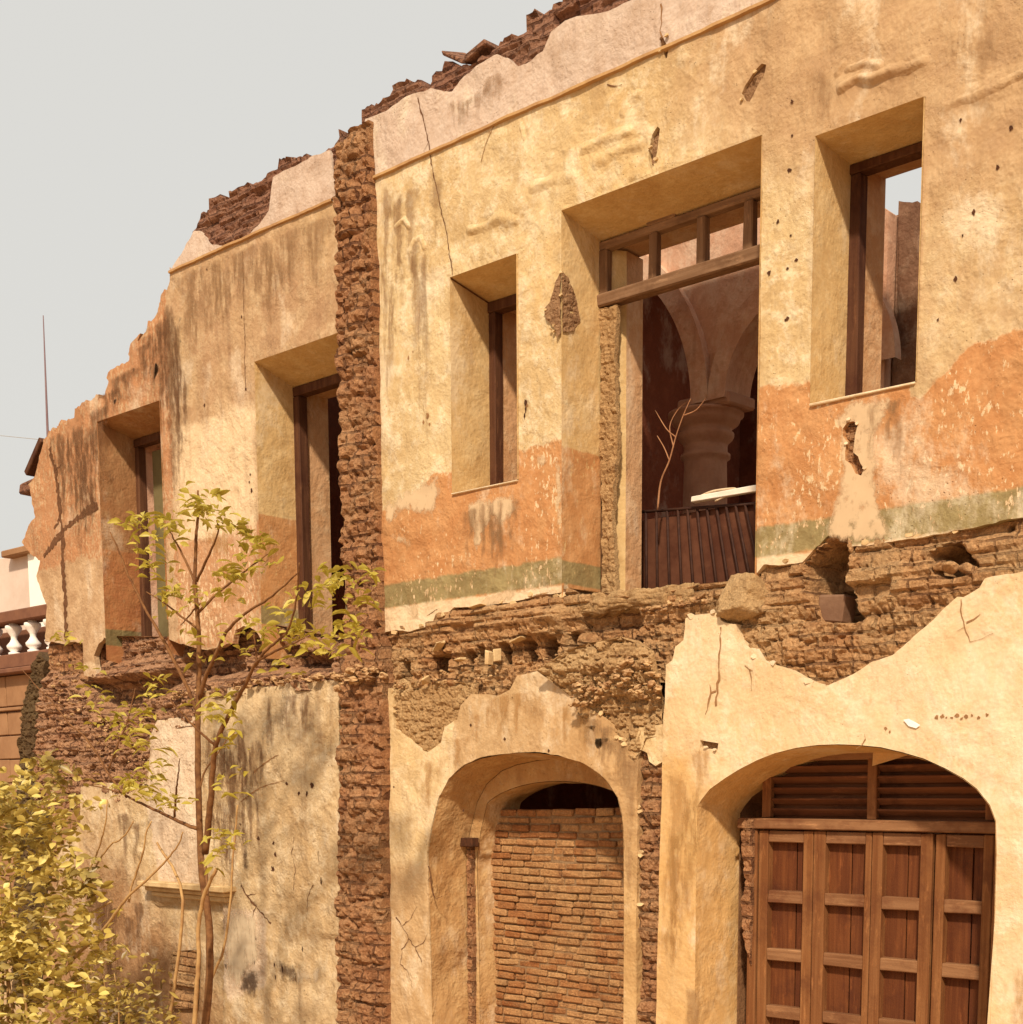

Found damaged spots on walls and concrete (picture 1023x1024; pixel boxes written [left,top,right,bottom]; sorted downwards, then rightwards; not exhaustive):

spalling [740,65,766,102]
spalling [648,129,660,165]
crack [417,98,489,303]
spalling [543,271,580,338]
peeling [386,477,437,521]
peeling [469,497,515,549]
spalling [725,398,1023,685]
crack [705,627,721,714]
spalling [32,625,346,812]
leakage [227,913,258,992]
leakage [279,961,319,981]
crack [396,866,442,986]